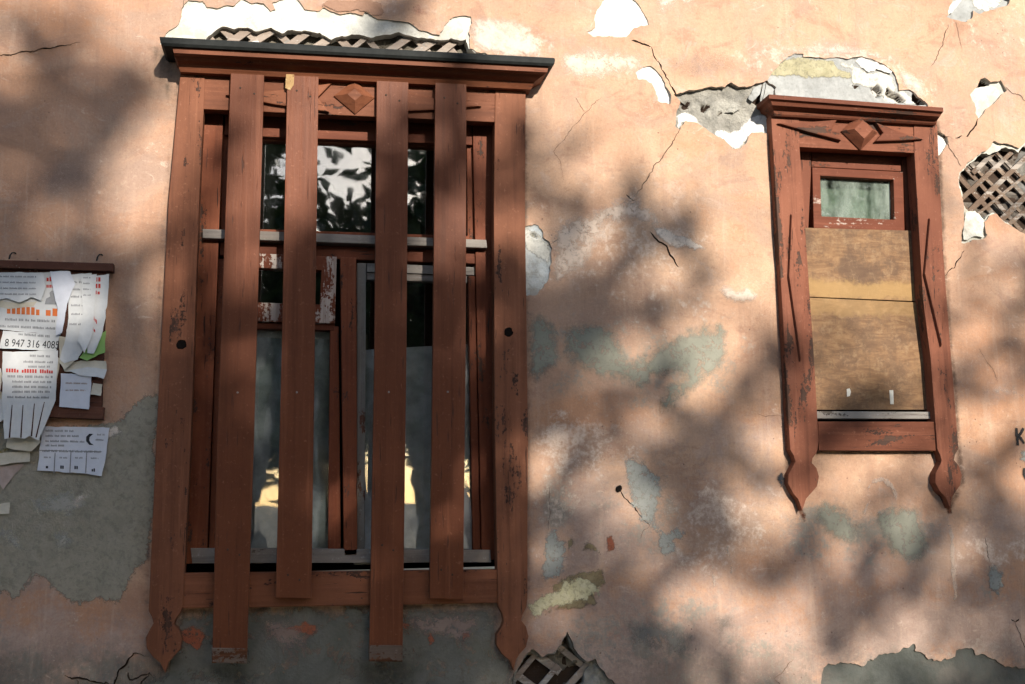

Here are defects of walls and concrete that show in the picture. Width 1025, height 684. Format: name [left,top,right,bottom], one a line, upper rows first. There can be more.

crack [0,42,77,56]
peeling [160,0,539,56]
flaking render [587,0,648,37]
crack [632,40,685,106]
flaking render [564,47,927,149]
flaking render [947,0,1008,22]
flaking render [970,79,1005,118]
crack [582,131,679,235]
flaking render [959,142,1025,243]
peeling [525,199,702,296]
flaking render [511,634,614,684]
peeling [821,644,1025,684]